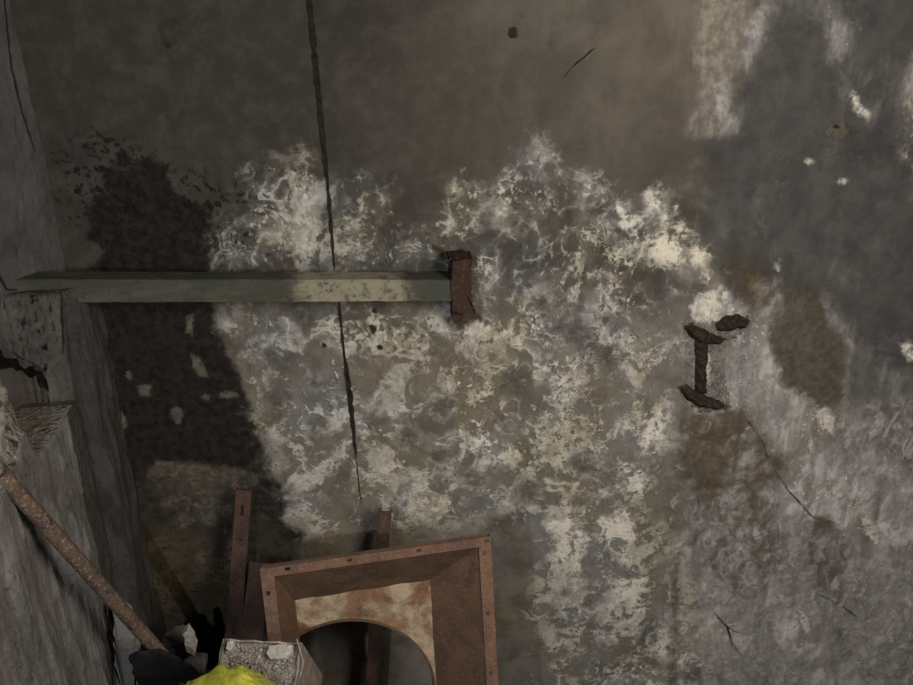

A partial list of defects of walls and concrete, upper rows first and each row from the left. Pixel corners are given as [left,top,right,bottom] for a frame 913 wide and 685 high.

crack [4,0,35,151]
crack [307,0,335,271]
water stain [54,127,377,272]
spalling [0,405,8,453]
crack [0,350,49,391]
crack [0,275,64,350]
crack [338,302,361,498]
corrosion [457,314,481,328]
water stain [223,0,913,685]
crack [742,413,818,519]
water stain [147,527,236,649]